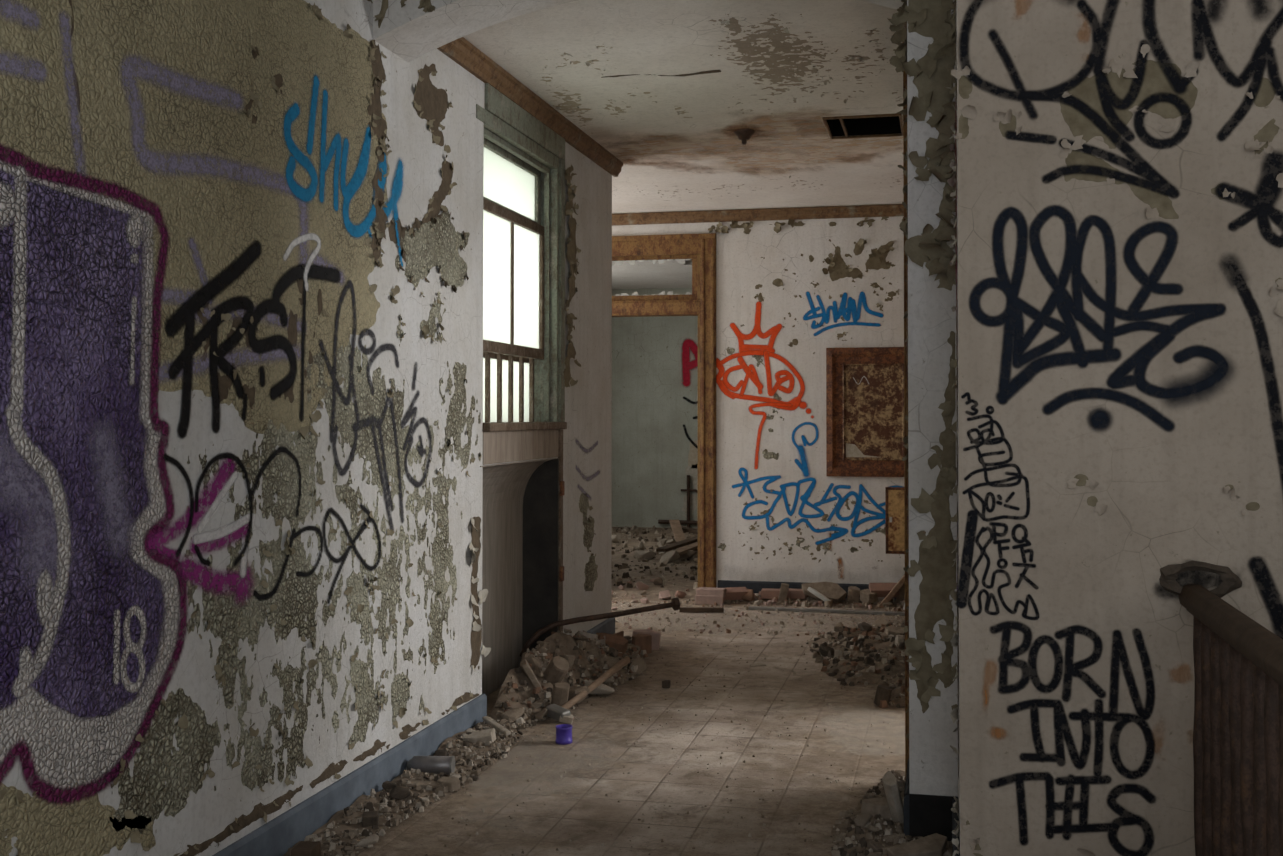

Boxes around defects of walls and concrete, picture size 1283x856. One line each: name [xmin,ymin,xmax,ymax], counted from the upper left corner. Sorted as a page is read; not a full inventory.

peeling [539,46,657,134]
peeling [993,109,1022,137]
peeling [563,165,581,387]
peeling [0,0,491,856]
peeling [708,0,979,776]
peeling [579,493,598,591]
peeling [951,796,983,856]